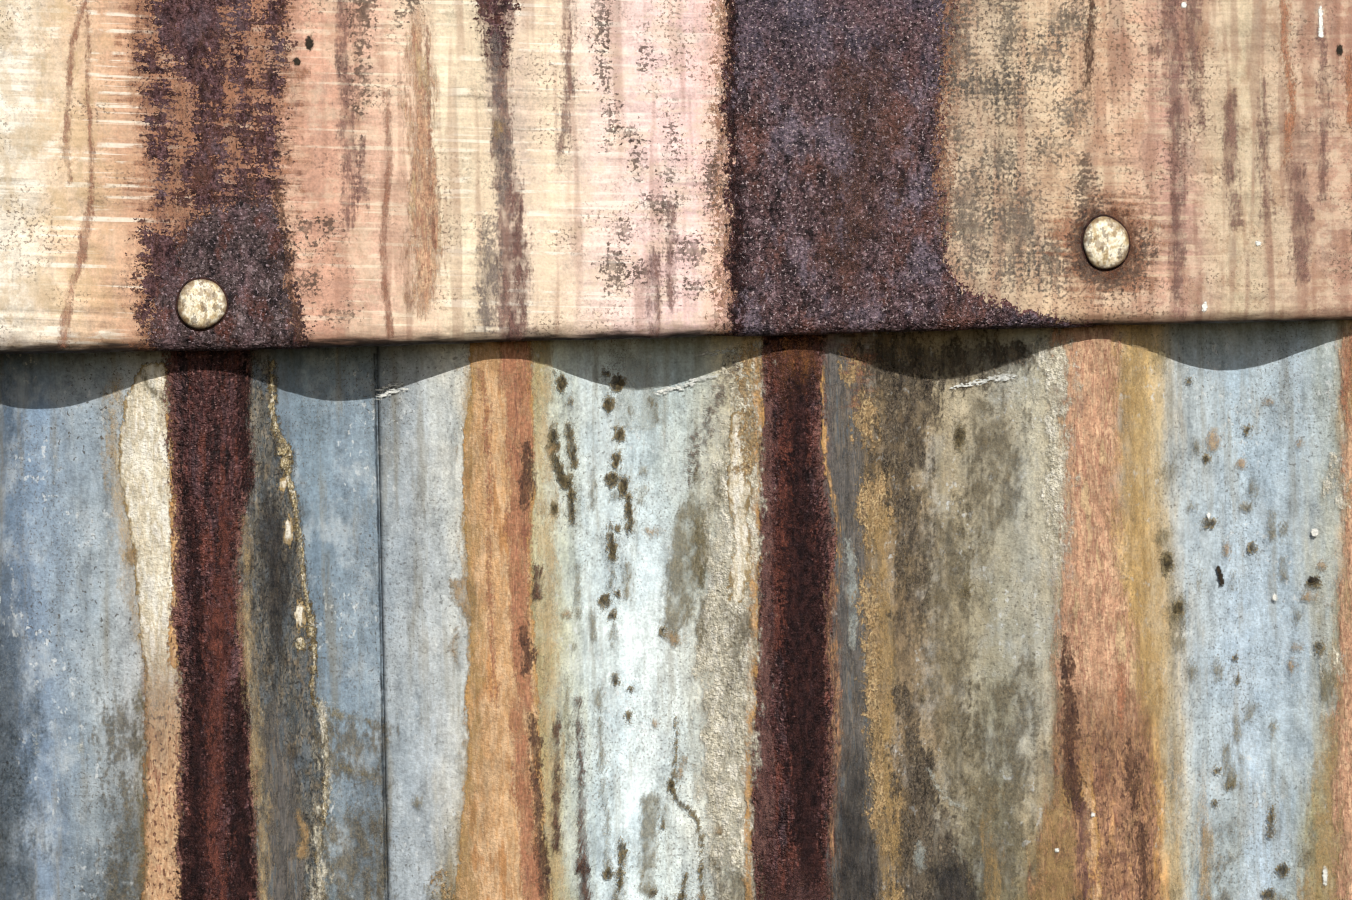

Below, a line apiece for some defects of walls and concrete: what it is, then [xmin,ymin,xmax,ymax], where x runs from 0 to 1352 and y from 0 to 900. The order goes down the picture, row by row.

corrosion [117,0,315,900]
corrosion [428,0,553,900]
water stain [883,674,980,900]
corrosion [703,0,1180,900]
corrosion [1171,594,1186,651]
corrosion [1211,712,1252,808]